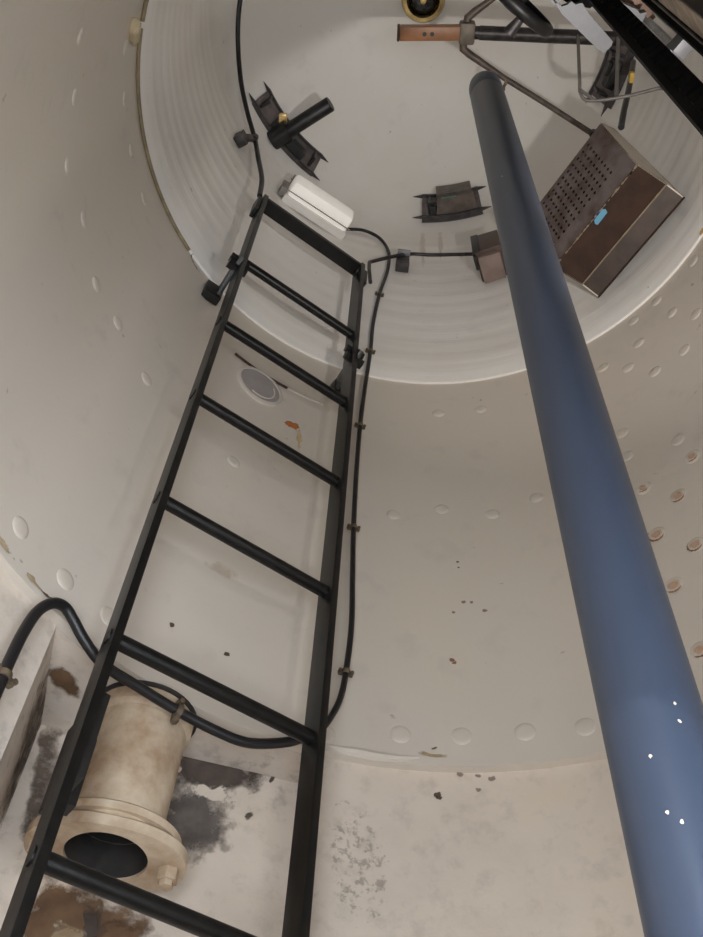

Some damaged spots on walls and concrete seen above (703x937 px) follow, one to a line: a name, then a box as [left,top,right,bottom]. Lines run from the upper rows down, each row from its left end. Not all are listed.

water stain [4,667,79,834]
water stain [166,756,275,851]